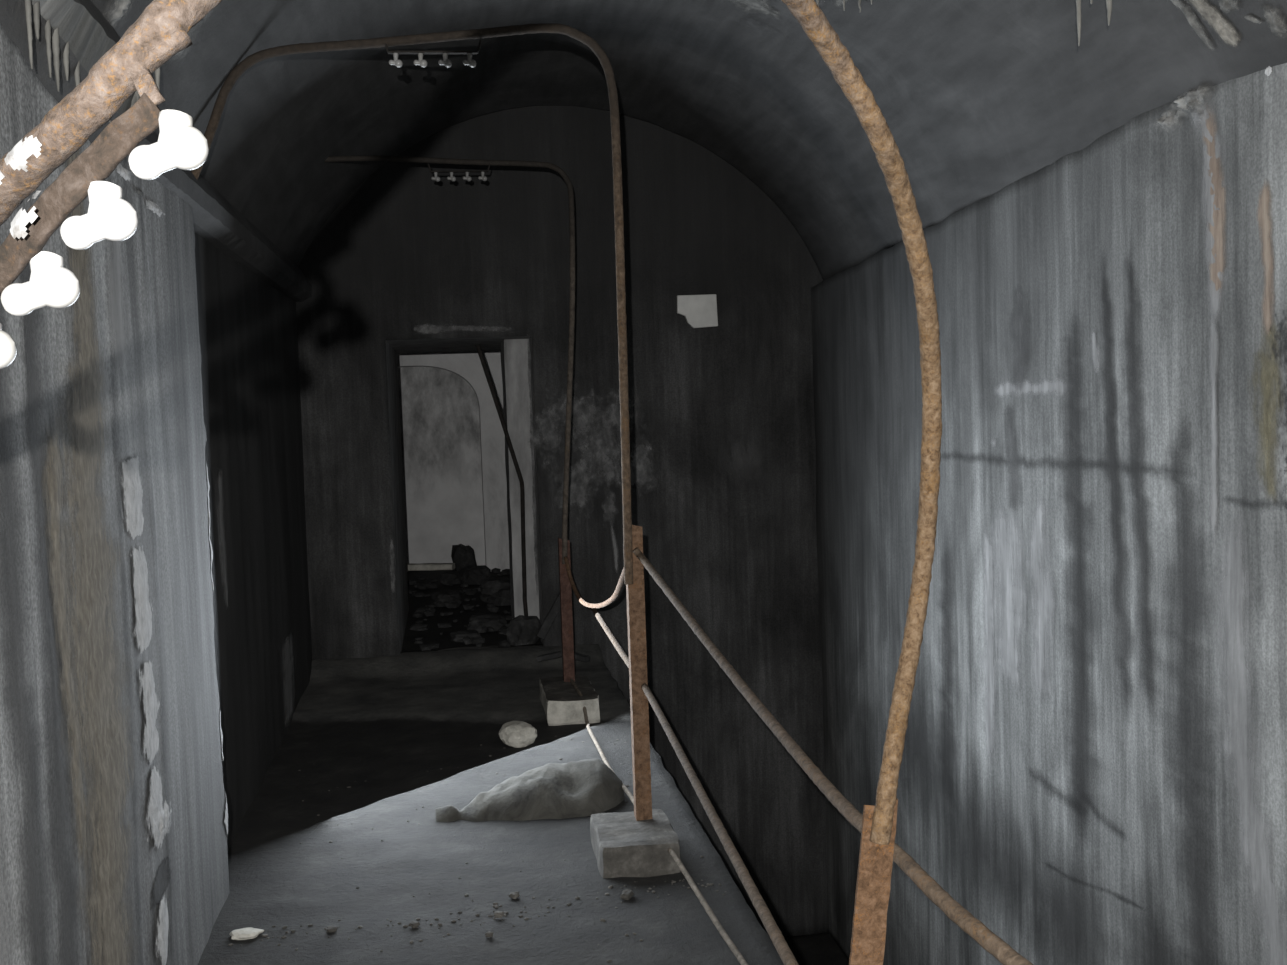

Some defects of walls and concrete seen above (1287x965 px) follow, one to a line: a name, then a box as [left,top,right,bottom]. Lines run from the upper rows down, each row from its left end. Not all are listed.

damp [1170,0,1287,50]
rust [1199,106,1225,531]
rust [1258,185,1273,331]
peeling [121,457,172,965]
damp [981,412,1054,755]
damp [1219,525,1287,965]